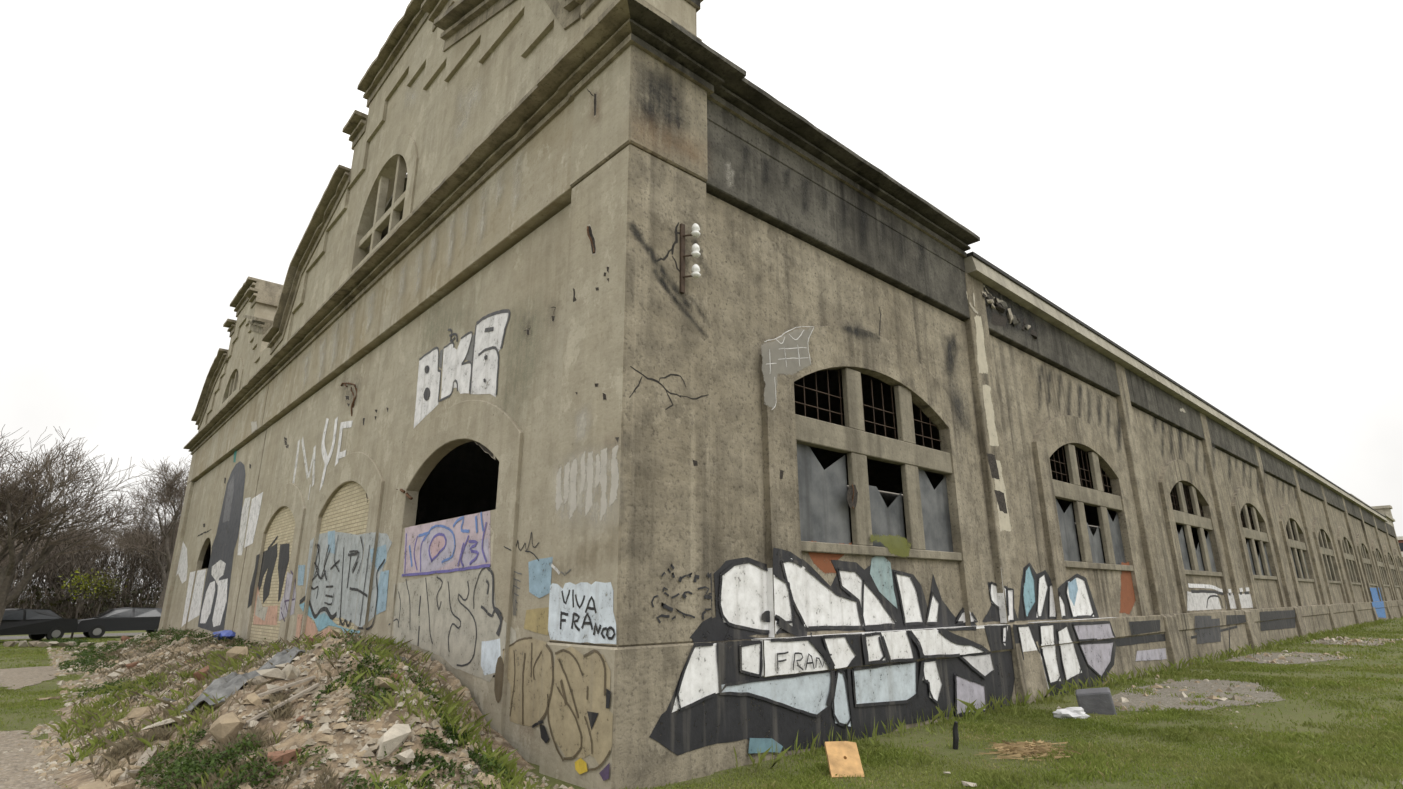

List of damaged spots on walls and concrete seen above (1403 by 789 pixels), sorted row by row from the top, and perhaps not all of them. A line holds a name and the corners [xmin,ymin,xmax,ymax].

crack [629,366,709,410]